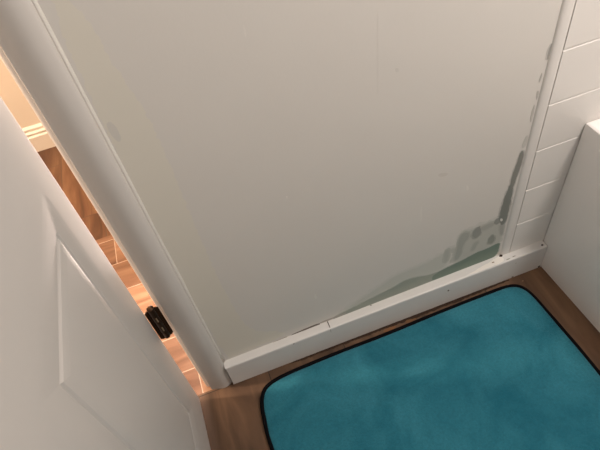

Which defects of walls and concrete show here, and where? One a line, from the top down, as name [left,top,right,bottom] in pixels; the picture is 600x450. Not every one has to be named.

damp [338,185,514,314]